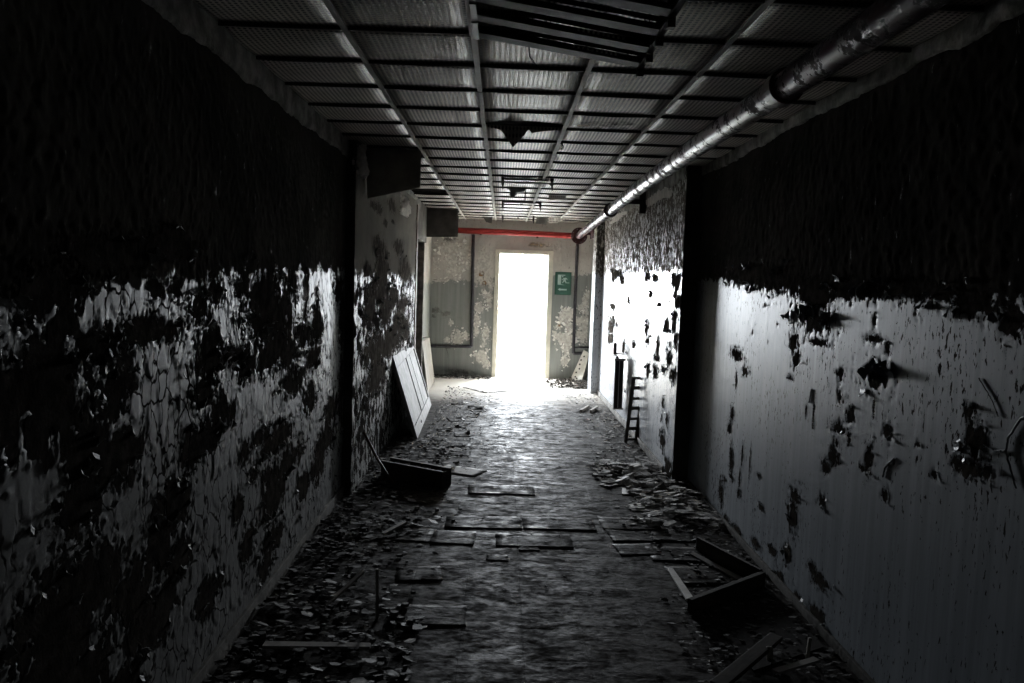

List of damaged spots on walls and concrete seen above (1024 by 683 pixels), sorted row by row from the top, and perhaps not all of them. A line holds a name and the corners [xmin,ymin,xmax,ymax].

spalling [646,187,672,207]
crack [177,363,199,451]
peeling [0,193,414,614]
peeling [605,266,682,384]
peeling [716,259,1024,490]
peeling [719,440,834,633]
peeling [128,563,226,661]